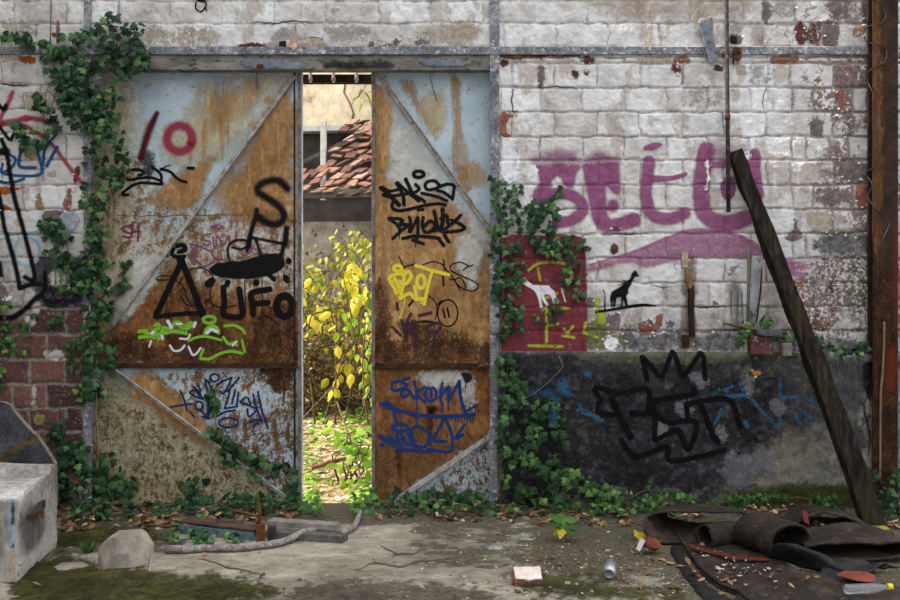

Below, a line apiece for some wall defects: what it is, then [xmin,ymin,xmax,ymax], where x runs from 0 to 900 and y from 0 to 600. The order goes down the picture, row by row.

peeling [793,0,867,47]
peeling [807,88,867,138]
rust [93,64,302,503]
rust [375,75,490,503]
spalling [785,157,867,352]
rust [873,0,898,487]
damp [716,358,841,495]
damp [825,354,870,453]